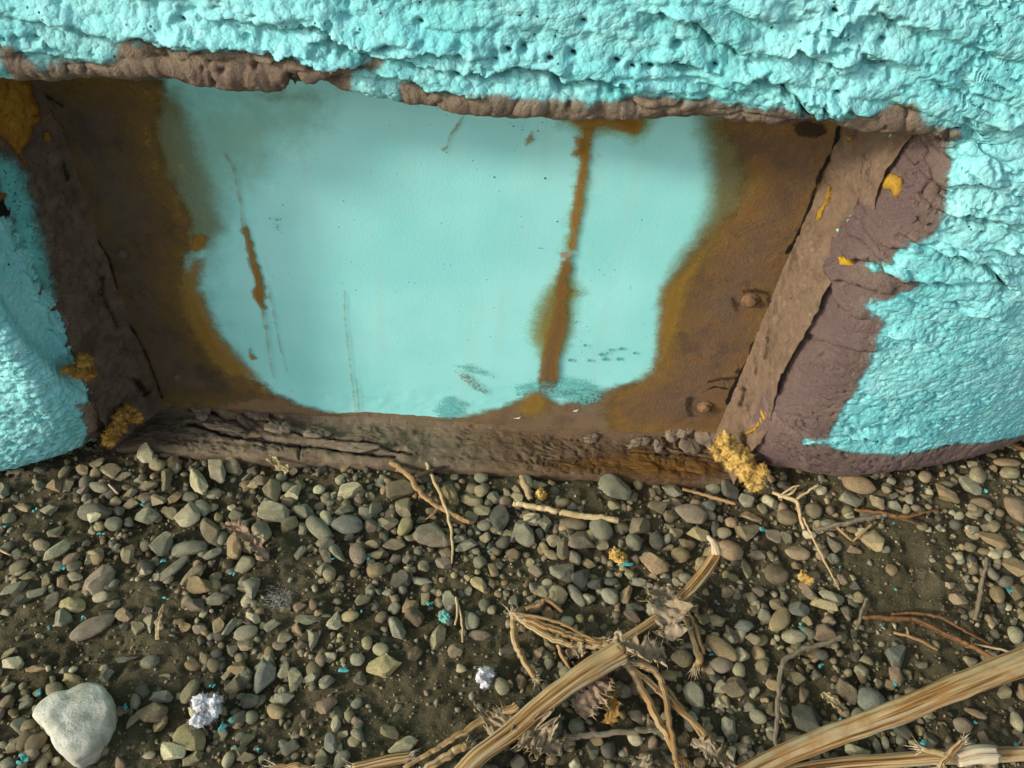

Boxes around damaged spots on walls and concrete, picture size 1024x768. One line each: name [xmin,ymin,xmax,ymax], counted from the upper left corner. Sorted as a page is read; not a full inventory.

rust [43,77,344,417]
rust [437,116,844,436]
spalling [793,120,827,139]
crack [785,111,852,254]
crack [685,288,772,417]
peeling [189,406,381,453]
peeling [677,428,717,450]